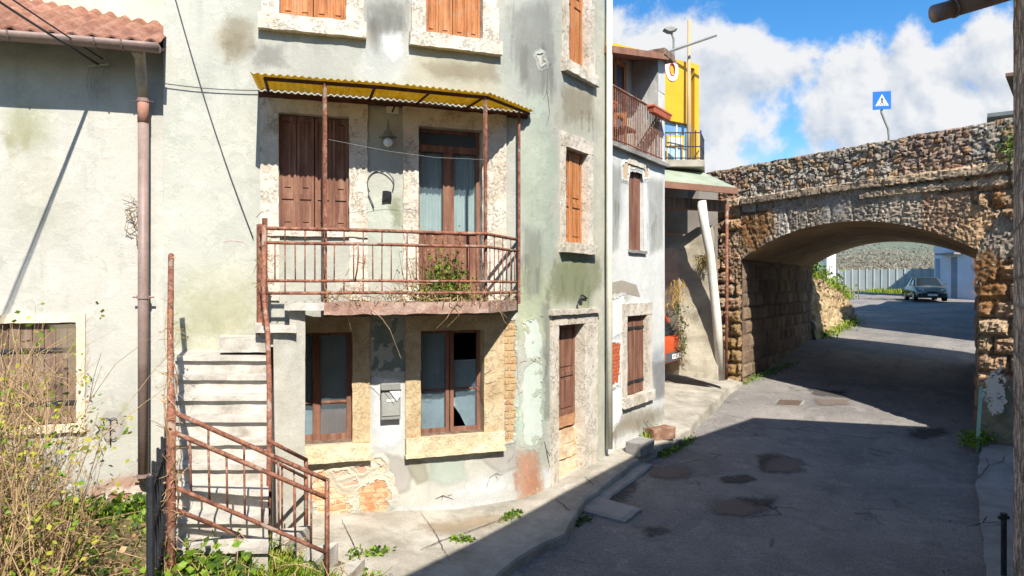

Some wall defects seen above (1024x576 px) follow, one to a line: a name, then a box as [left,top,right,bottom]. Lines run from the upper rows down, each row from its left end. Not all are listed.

peeling [370,314,410,377]
peeling [504,313,546,453]
peeling [605,292,627,432]
peeling [308,448,398,514]